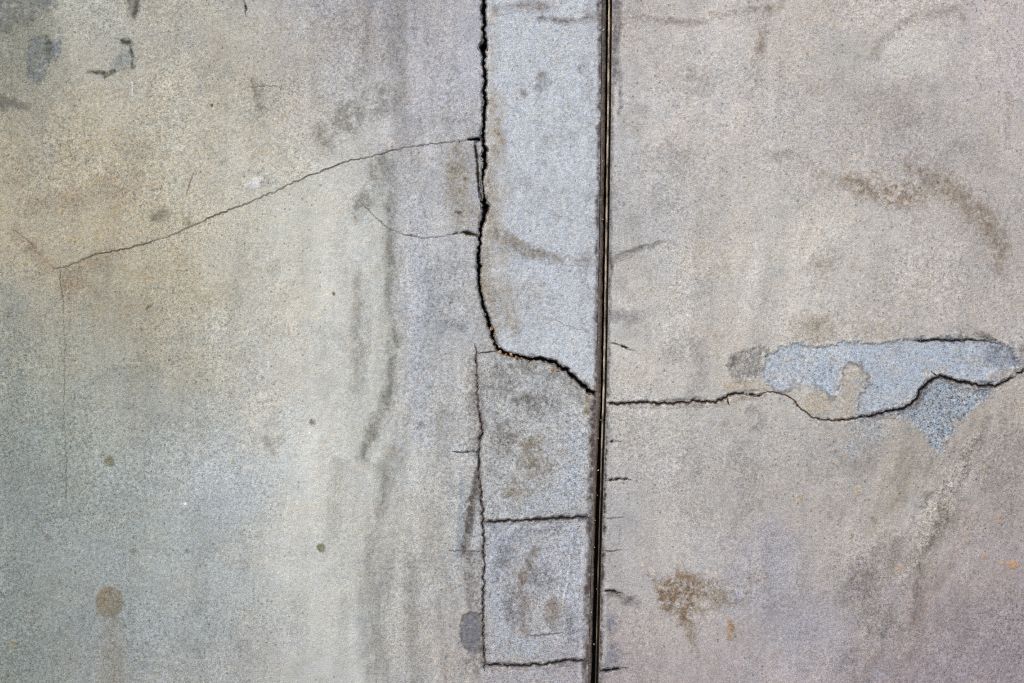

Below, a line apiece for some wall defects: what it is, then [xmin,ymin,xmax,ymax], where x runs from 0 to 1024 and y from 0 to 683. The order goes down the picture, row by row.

crack [13,0,600,671]
crack [555,320,636,351]
crack [606,368,1024,423]
peeling [724,332,1018,457]
rust [639,559,738,660]